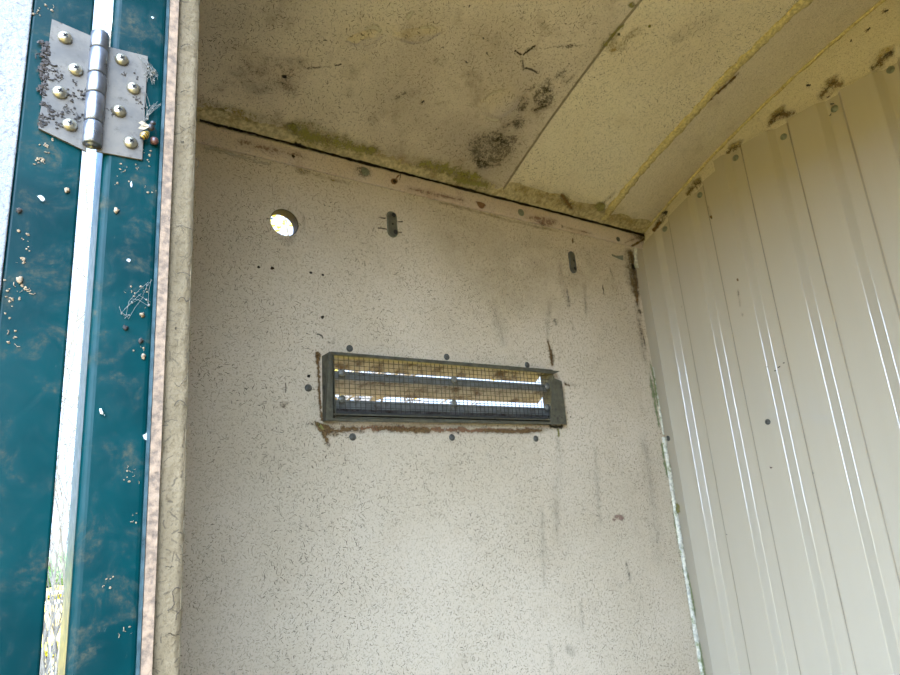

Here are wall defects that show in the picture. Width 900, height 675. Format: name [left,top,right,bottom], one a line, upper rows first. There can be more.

leakage [871,48,893,70]
leakage [820,77,843,98]
leakage [469,69,573,170]
leakage [768,108,795,125]
leakage [625,211,668,360]
corrosion [354,425,563,437]